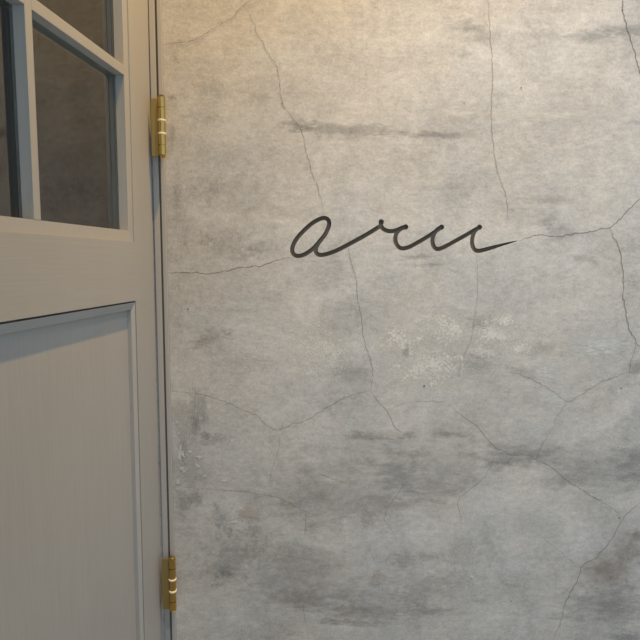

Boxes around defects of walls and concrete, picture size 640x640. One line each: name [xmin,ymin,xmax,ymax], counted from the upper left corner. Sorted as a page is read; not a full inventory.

crack [622,1,640,73]
crack [170,257,289,274]
crack [519,199,640,346]